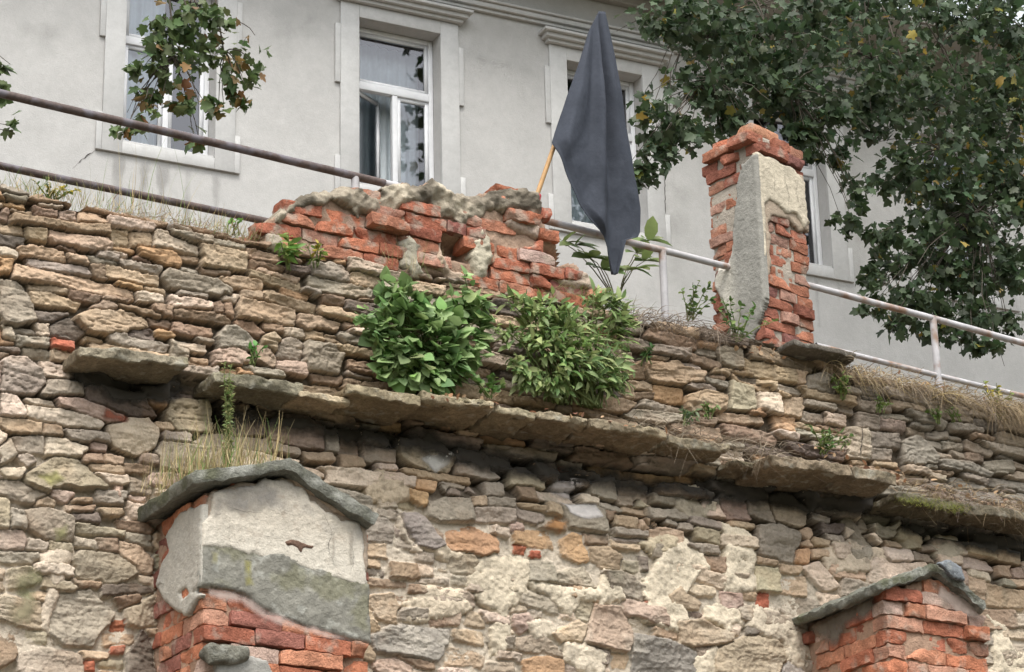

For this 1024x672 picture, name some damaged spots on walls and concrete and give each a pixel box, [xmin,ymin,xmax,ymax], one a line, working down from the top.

flaking render [714,152,810,339]
leakage [217,593,285,623]
flaking render [156,477,368,617]